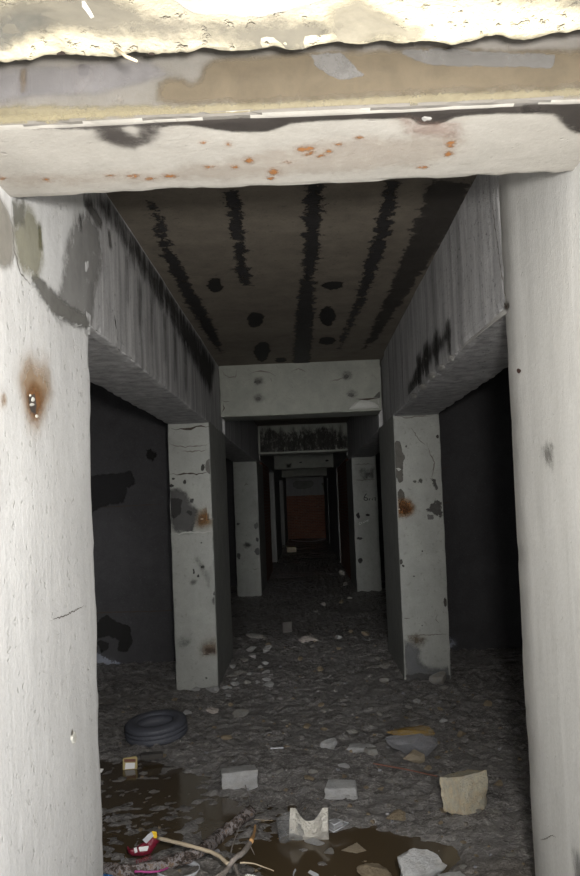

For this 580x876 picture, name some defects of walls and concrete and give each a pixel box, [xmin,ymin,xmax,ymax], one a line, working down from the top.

peeling [174,0,320,17]
damp [223,189,254,286]
damp [254,180,403,363]
corrosion [22,363,49,420]
corrosion [398,499,414,517]
peeling [395,441,443,520]